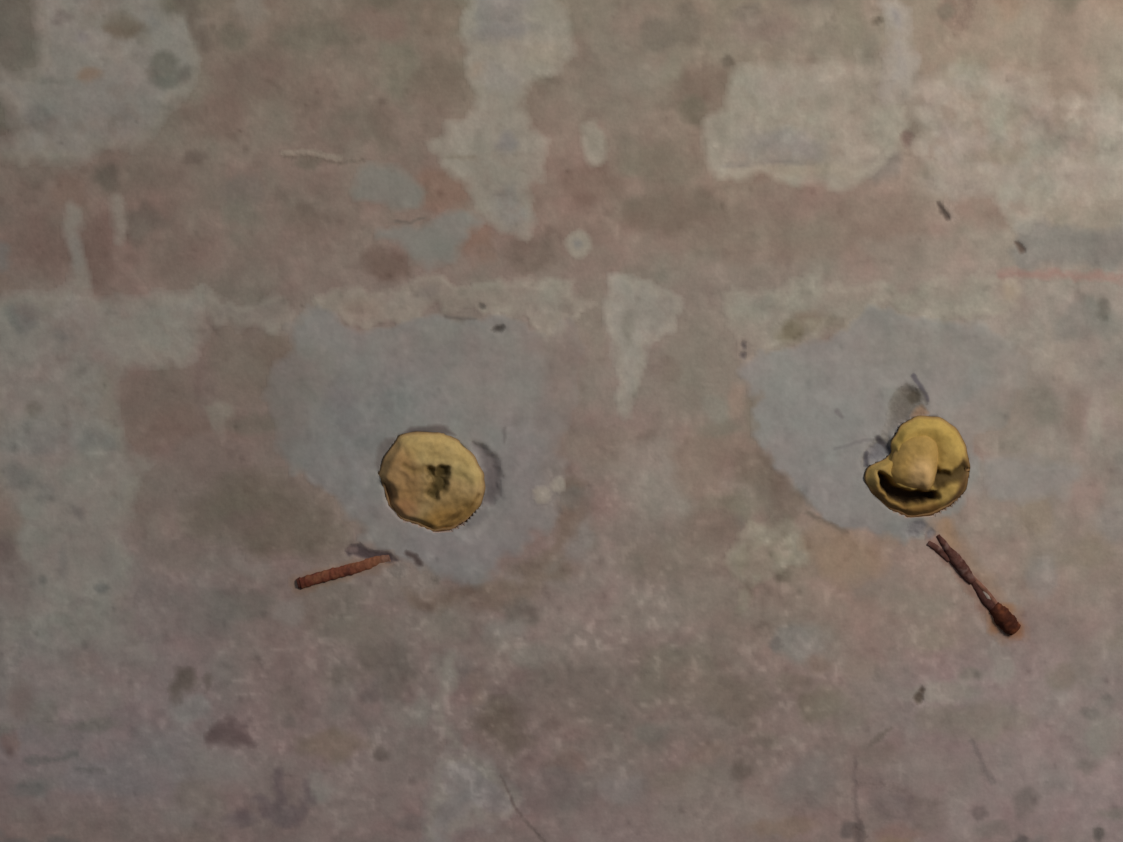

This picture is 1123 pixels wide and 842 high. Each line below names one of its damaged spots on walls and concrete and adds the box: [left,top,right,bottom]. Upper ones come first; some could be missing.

corrosion [287,549,399,597]
corrosion [922,513,1031,647]